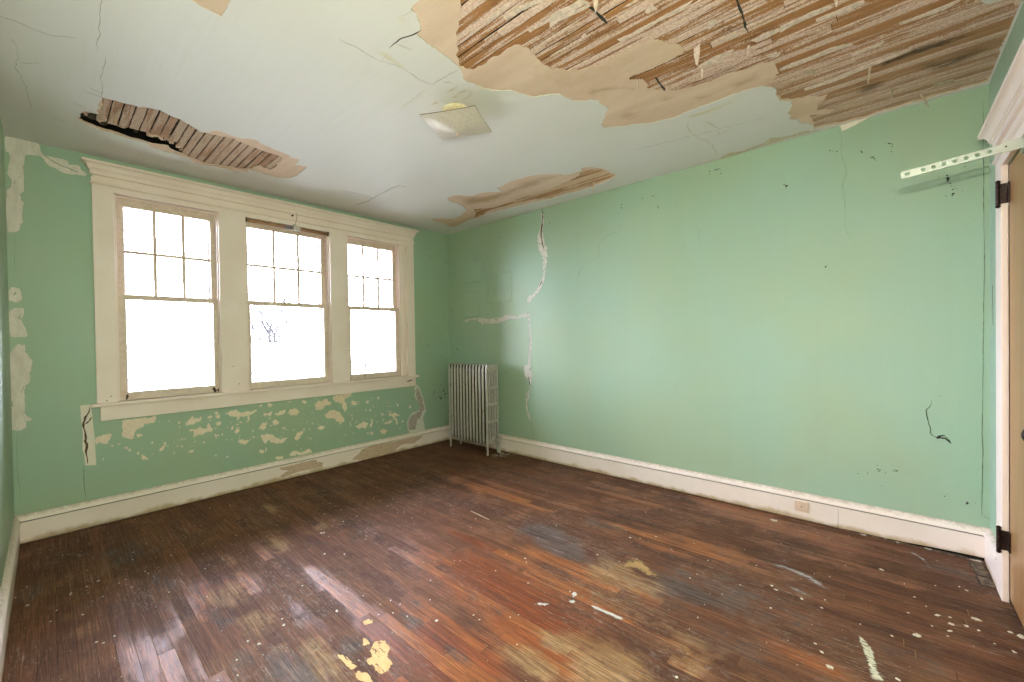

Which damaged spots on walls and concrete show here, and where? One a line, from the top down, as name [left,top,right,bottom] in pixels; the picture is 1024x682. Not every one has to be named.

spalling [456,0,1021,159]
spalling [80,98,282,169]
spalling [474,169,614,218]
crack [524,211,548,439]
crack [82,407,92,494]
peeling [95,380,426,463]